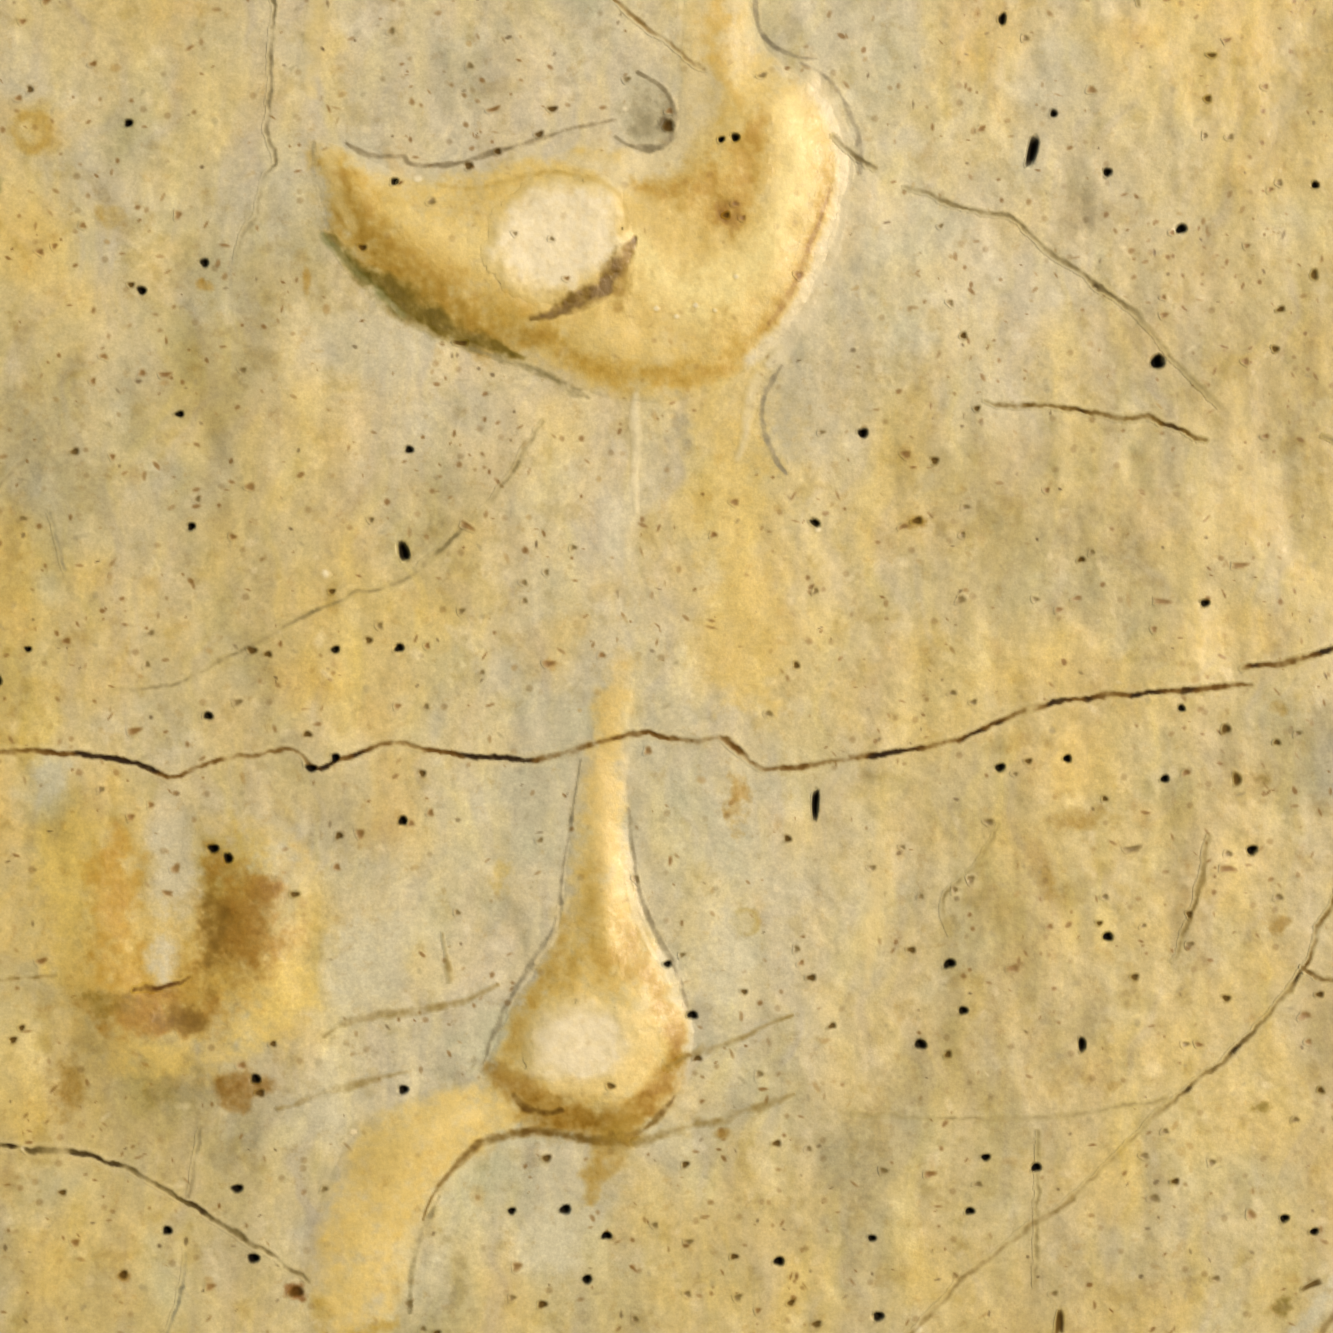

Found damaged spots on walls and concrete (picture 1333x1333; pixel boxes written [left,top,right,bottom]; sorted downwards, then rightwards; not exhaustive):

crack [609,0,708,73]
crack [830,132,1222,444]
crack [1320,432,1333,444]
crack [0,644,1333,782]
crack [1170,832,1214,965]
crack [0,972,58,984]
crack [130,974,193,994]
crack [850,894,1333,1333]
crack [0,1124,313,1285]
crack [164,1250,190,1333]